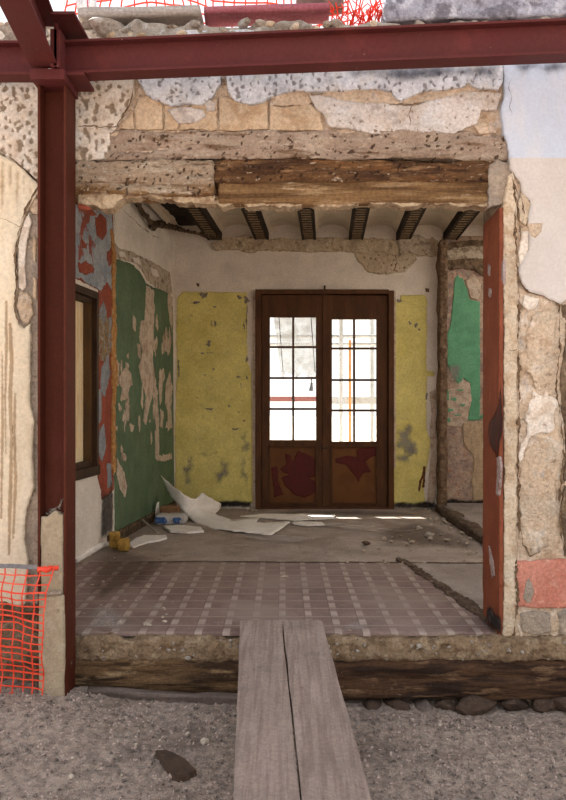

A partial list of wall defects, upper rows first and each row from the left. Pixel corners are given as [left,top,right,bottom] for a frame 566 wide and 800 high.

flaking render [110,79,503,138]
flaking render [15,196,38,604]
peeling [76,187,492,503]
flaking render [514,177,566,561]
flaking render [515,607,566,636]